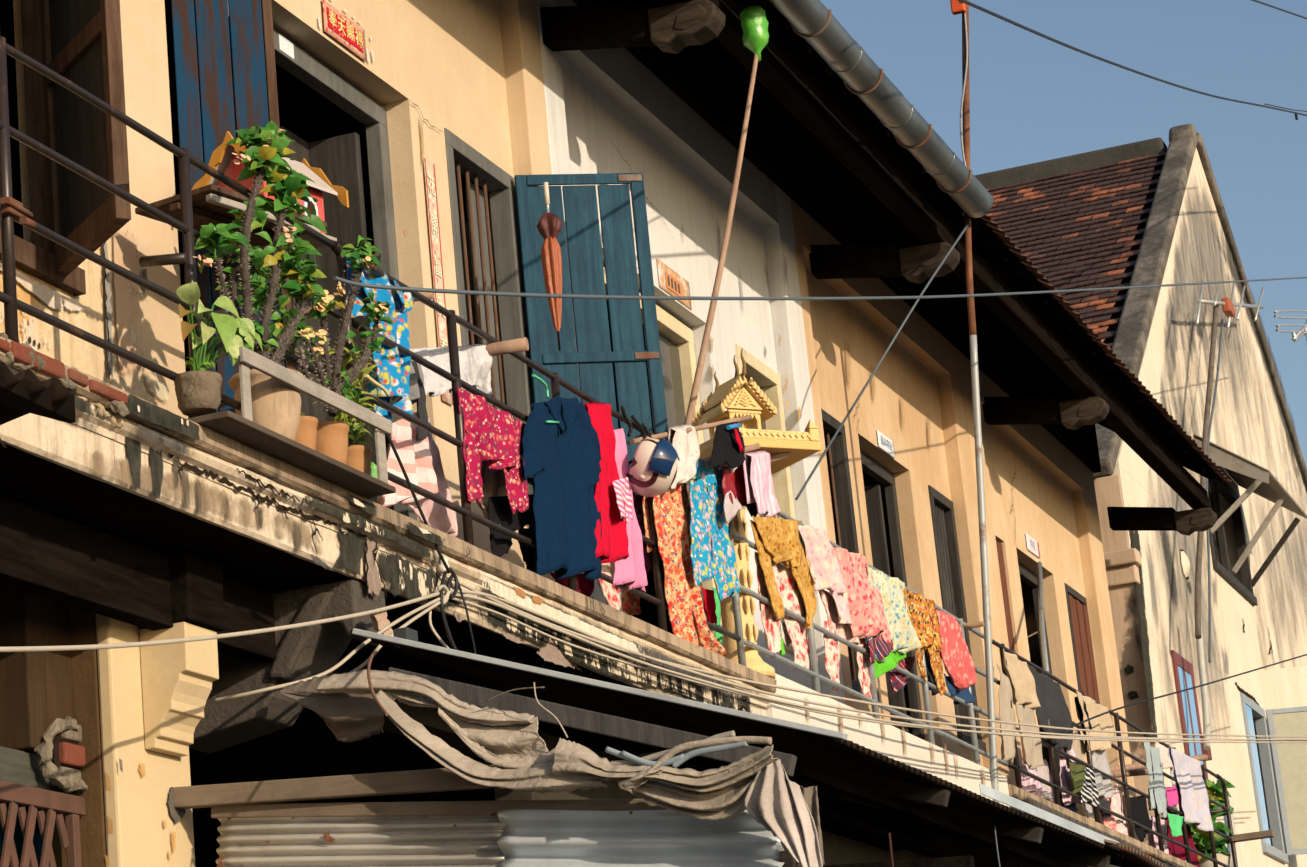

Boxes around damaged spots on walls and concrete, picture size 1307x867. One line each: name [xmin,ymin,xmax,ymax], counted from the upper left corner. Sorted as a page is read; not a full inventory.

peeling [0,231,168,428]
crack [160,449,366,554]
peeling [303,495,441,598]
damp [92,394,751,713]
damp [1130,531,1229,738]
damp [1159,192,1307,654]